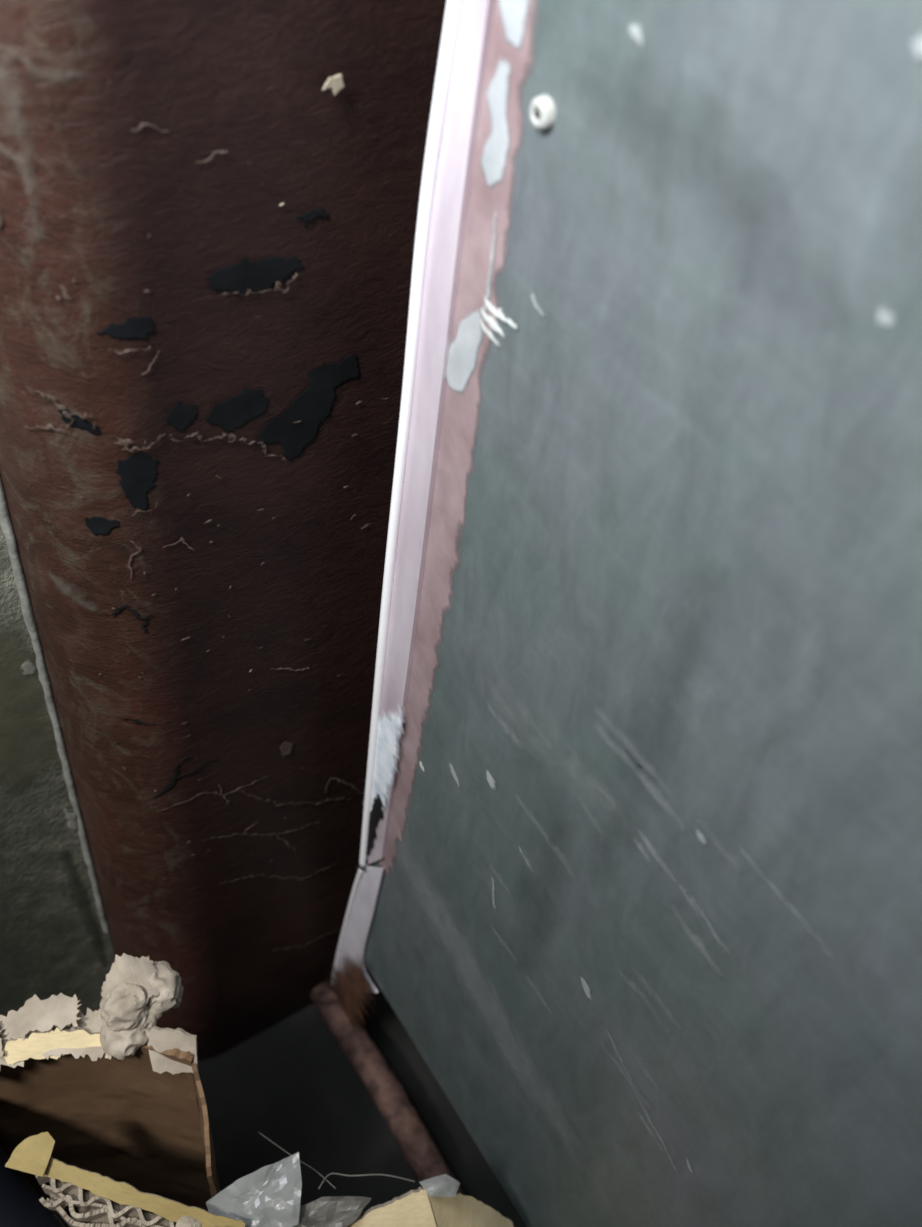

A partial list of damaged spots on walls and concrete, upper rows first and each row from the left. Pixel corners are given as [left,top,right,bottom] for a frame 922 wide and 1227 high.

peeling [499,0,529,48]
peeling [481,60,510,187]
peeling [209,256,303,296]
peeling [446,220,517,392]
peeling [96,316,154,355]
peeling [115,354,359,516]
peeling [84,516,119,535]